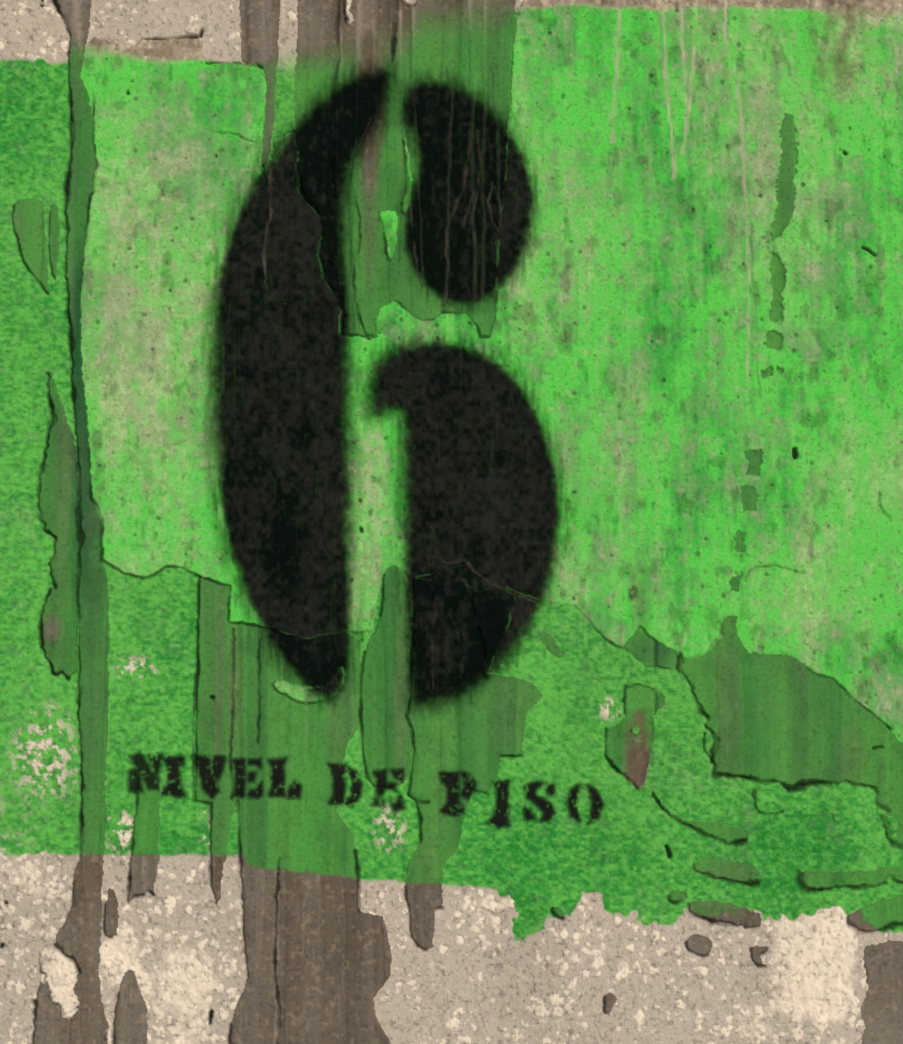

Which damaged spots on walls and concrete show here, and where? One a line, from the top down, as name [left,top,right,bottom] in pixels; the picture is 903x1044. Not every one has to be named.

peeling [205,0,280,171]
peeling [293,0,515,340]
peeling [11,0,161,1044]
peeling [191,565,543,1044]
peeling [603,683,760,888]
peeling [624,615,903,851]
peeling [666,890,769,969]
peeling [793,866,903,1044]